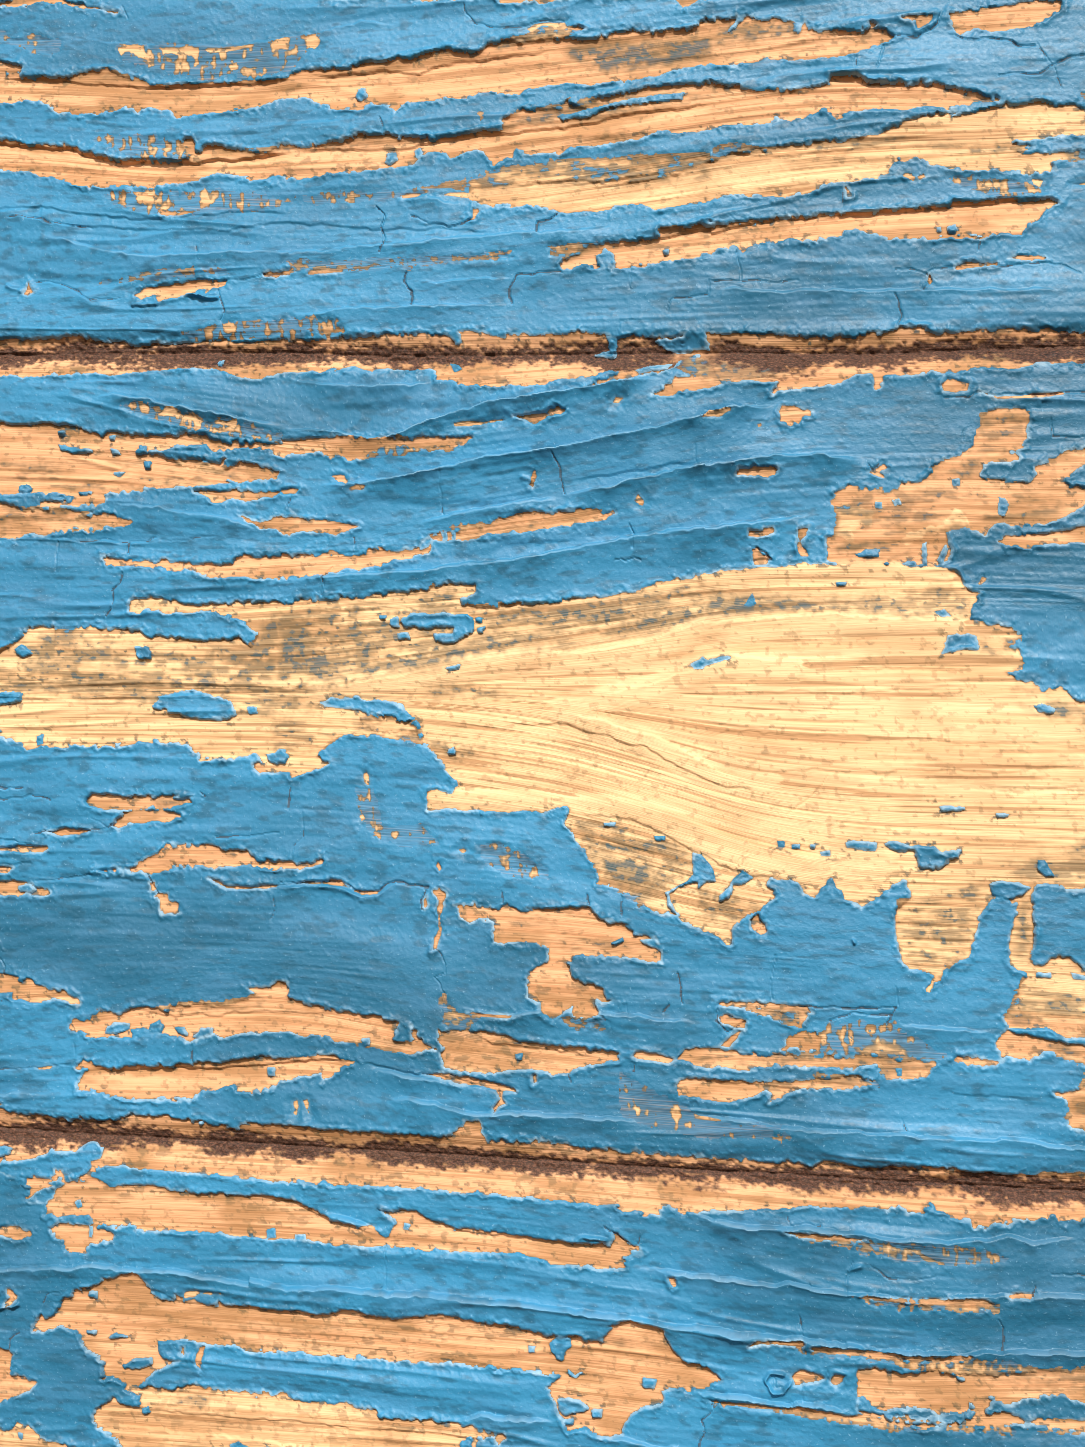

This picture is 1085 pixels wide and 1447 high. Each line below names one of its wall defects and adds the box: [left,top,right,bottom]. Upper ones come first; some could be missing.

peeling [0,0,118,14]
peeling [901,0,1061,35]
peeling [0,11,1085,271]
peeling [97,265,229,301]
peeling [264,249,514,278]
peeling [0,335,169,378]
peeling [180,314,1057,426]
peeling [0,392,1085,1269]
peeling [4,1289,17,1307]
peeling [32,1272,1085,1447]
peeling [0,1348,67,1447]